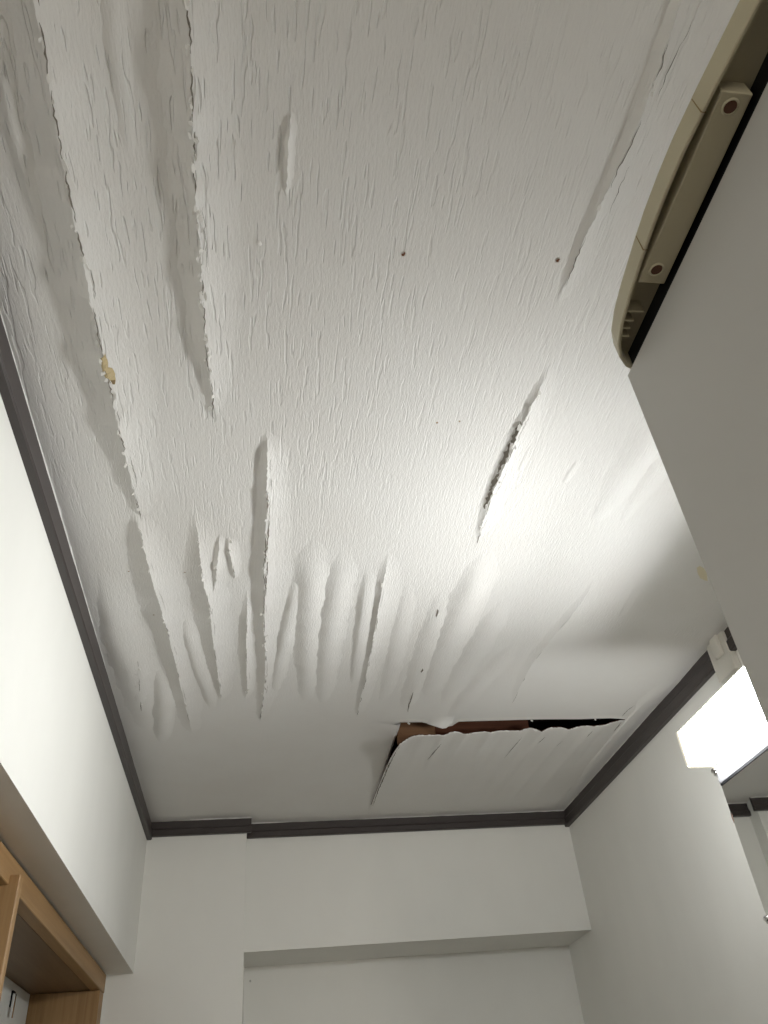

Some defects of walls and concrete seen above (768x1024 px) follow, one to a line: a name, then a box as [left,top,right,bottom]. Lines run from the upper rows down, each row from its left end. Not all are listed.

peeling [99,354,116,384]